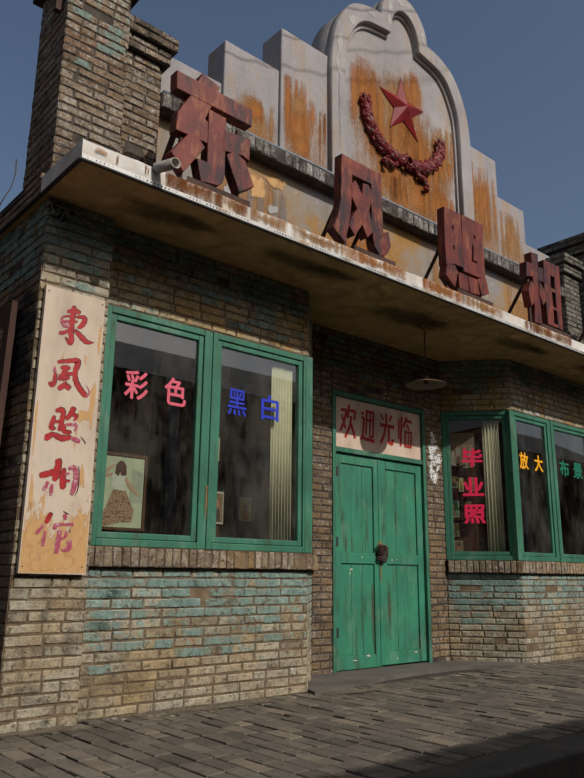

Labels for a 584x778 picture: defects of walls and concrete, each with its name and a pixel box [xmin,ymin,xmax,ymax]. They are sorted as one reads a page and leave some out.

corrosion [240,98,273,143]
corrosion [284,76,326,165]
corrosion [351,62,454,222]
corrosion [166,172,406,280]
corrosion [472,167,524,264]